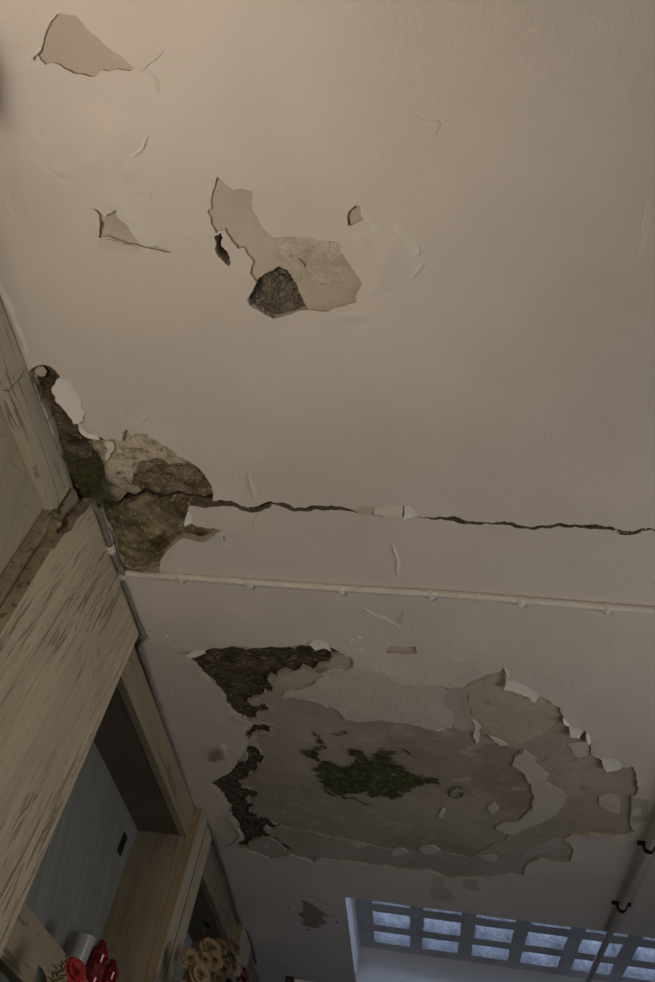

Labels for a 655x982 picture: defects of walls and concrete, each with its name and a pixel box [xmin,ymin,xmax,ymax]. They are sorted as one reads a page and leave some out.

peeling [13,14,164,92]
peeling [77,207,168,255]
flaking render [208,177,371,323]
flaking render [32,365,227,572]
crack [105,488,213,504]
crack [357,505,418,520]
peeling [184,639,650,900]